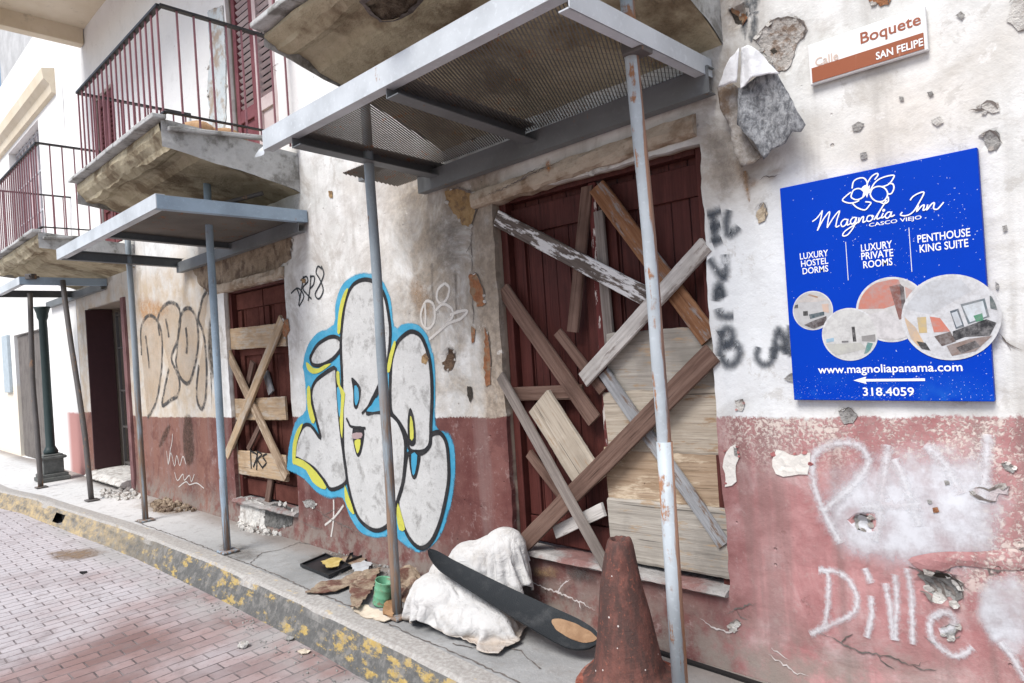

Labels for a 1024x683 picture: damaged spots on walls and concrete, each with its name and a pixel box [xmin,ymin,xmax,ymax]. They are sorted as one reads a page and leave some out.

spalling [359,0,424,22]
spalling [753,16,808,71]
spalling [971,100,1000,115]
spalling [979,130,1002,151]
spalling [444,186,477,229]
spalling [468,272,486,307]
spalling [442,348,456,372]
spalling [838,407,857,424]
spalling [969,461,1017,502]
spalling [917,569,964,609]
crack [821,633,960,671]